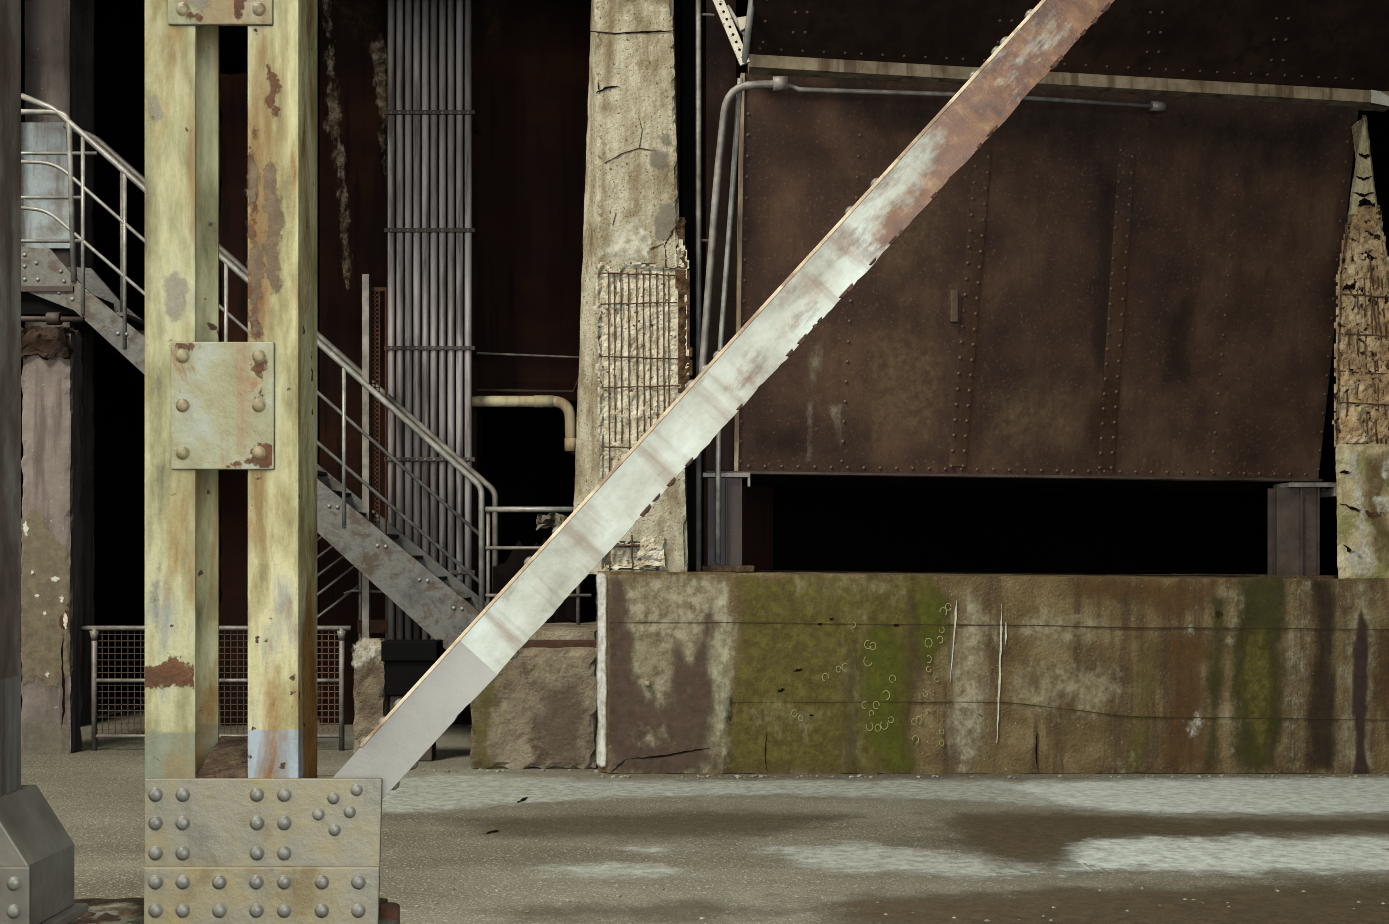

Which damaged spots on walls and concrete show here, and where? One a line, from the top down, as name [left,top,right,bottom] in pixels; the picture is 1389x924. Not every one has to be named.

crack [589,28,676,36]
rust [265,64,282,117]
rust [248,125,258,240]
crack [605,119,650,163]
peeling [650,133,672,168]
rust [869,192,938,265]
rust [248,264,265,339]
spalling [593,203,692,482]
spalling [1332,198,1389,447]
water stain [1289,453,1389,773]
rust [145,656,194,689]